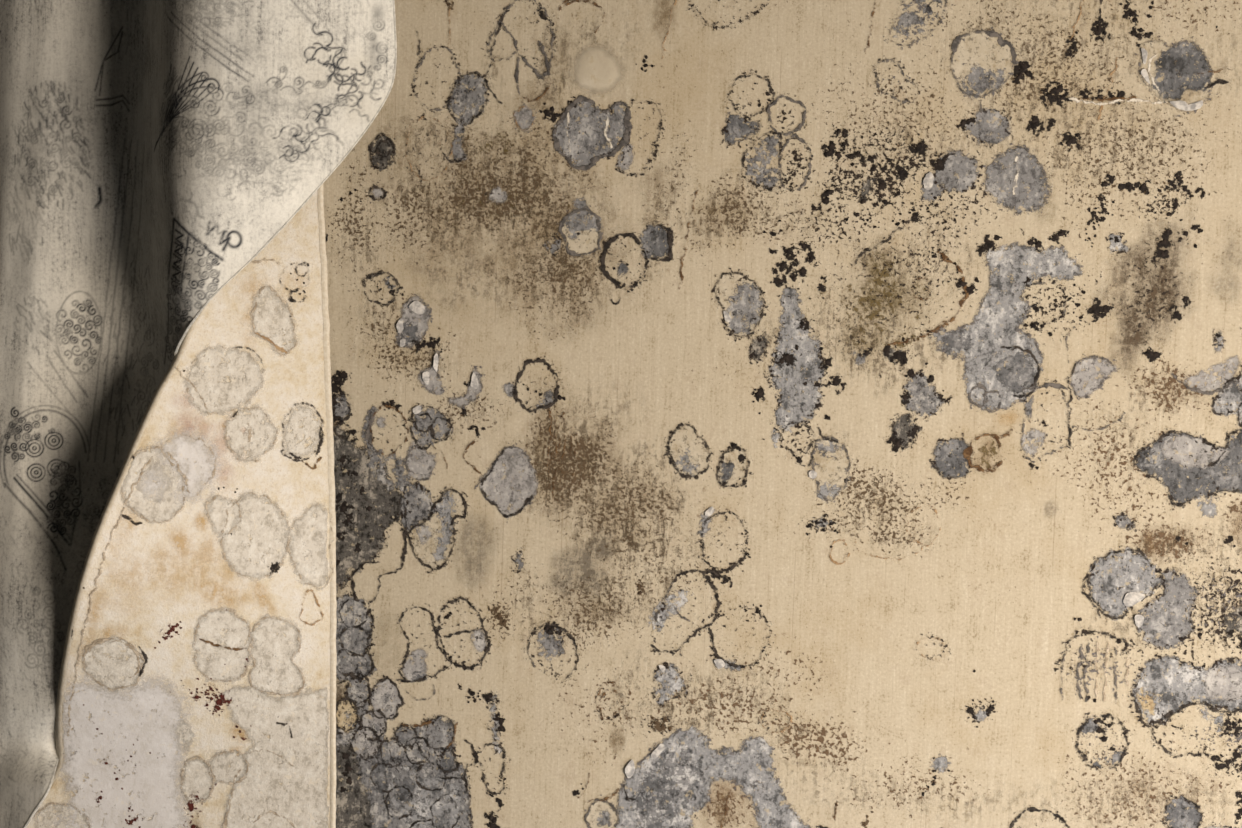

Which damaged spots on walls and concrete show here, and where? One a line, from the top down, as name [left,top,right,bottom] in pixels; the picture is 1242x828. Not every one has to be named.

leakage [325,96,649,440]
peeling [709,268,827,434]
leakage [642,0,1242,672]
peeling [887,229,1084,453]
peeling [1129,365,1242,518]
leakage [170,678,232,716]
peeling [35,286,538,828]
leakage [484,773,507,828]
peeling [584,726,813,828]
leakage [483,375,977,817]
leakage [1059,710,1242,828]
peeling [1082,546,1242,728]